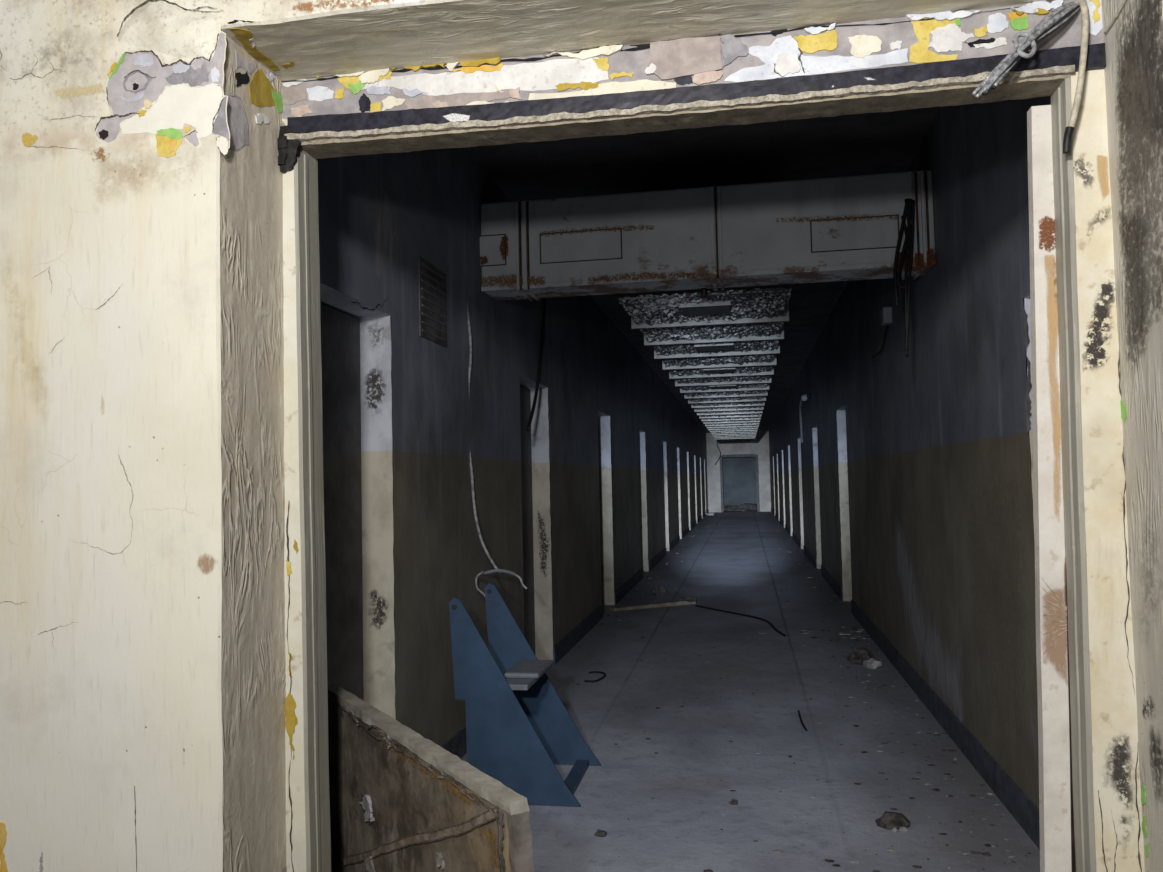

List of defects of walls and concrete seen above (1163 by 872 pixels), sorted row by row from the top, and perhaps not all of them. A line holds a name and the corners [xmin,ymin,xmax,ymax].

crack [117,0,253,36]
corrosion [293,0,388,11]
peeling [693,0,1063,86]
peeling [95,28,676,158]
water stain [1086,0,1163,366]
corrosion [500,236,508,260]
corrosion [480,256,544,287]
corrosion [1039,216,1061,500]
crack [71,455,133,554]
corrosion [1041,558,1067,677]
water stain [1112,740,1132,803]
spalling [0,822,8,872]